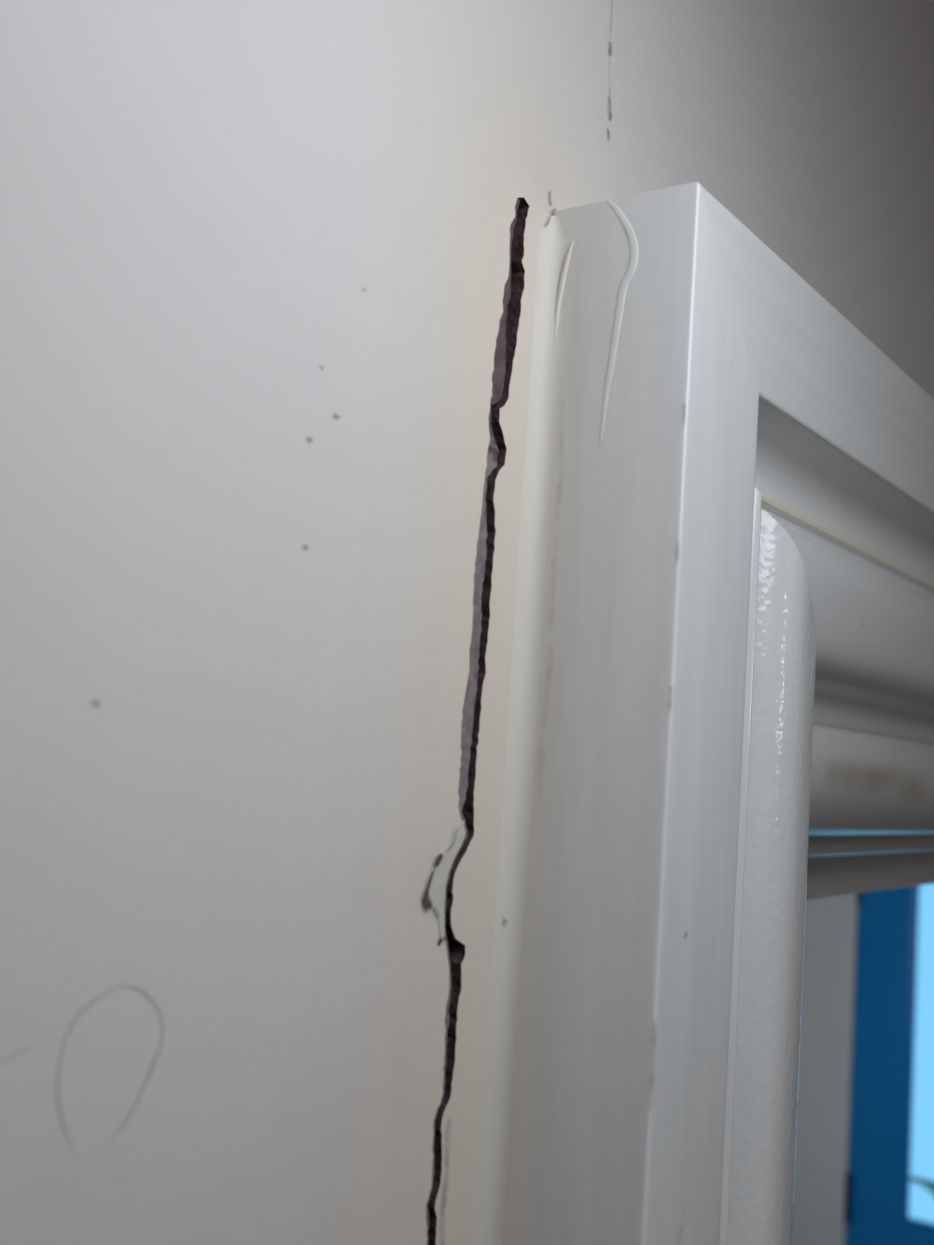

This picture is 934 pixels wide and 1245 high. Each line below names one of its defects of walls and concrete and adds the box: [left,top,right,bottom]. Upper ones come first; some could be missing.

crack [426,192,556,1245]